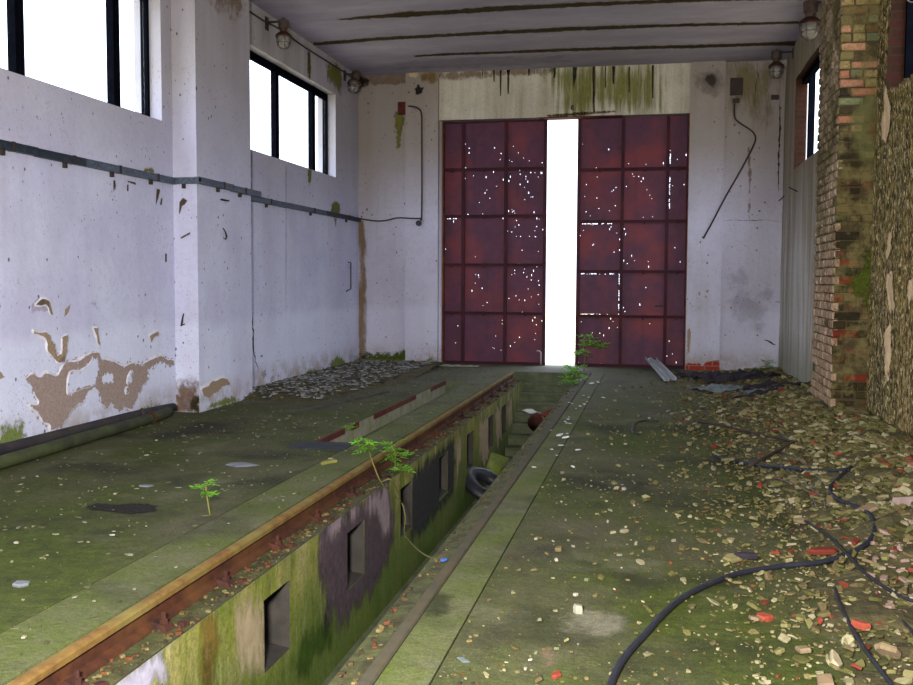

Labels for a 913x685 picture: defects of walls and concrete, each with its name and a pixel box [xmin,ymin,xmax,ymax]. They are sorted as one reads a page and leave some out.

water stain [439,68,556,96]
water stain [592,66,615,112]
peeling [34,297,53,316]
crack [252,316,267,377]
peeling [25,326,174,432]
water stain [478,395,512,466]
spalling [83,372,606,685]
water stain [236,603,265,672]
water stain [116,654,167,685]